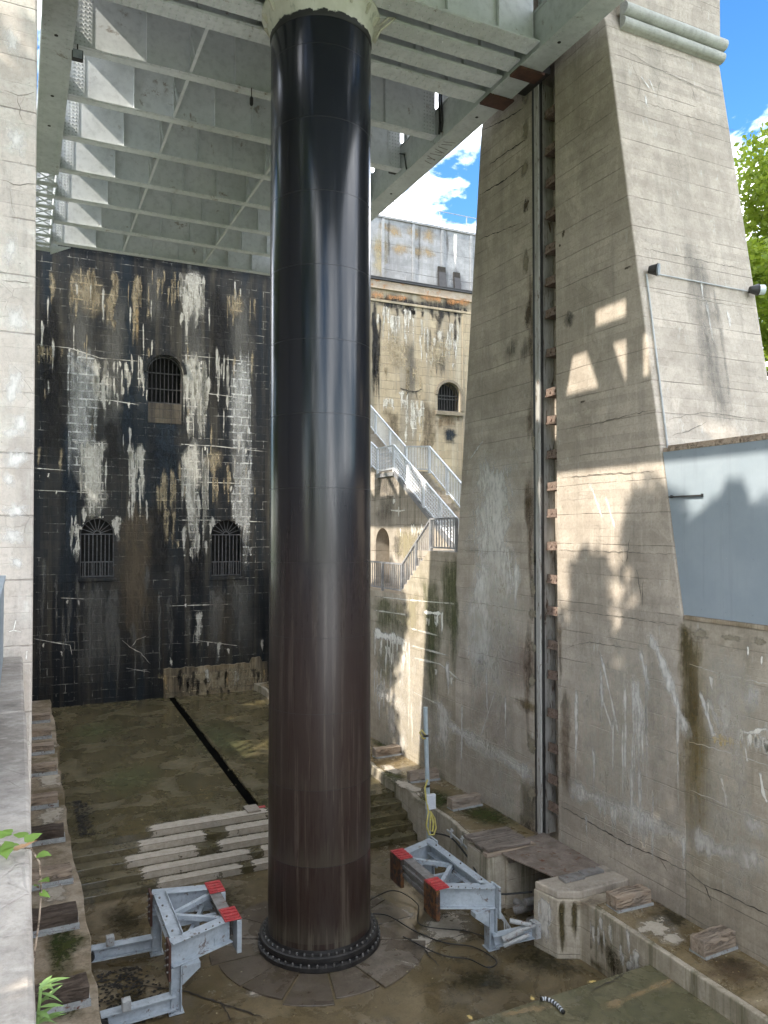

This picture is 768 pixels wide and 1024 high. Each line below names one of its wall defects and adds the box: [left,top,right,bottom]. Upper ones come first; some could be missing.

crack [480,140,525,195]
leakage [371,296,467,449]
leakage [38,268,263,695]
leakage [374,567,459,752]
leakage [448,564,528,778]
leakage [572,629,768,870]
leakage [538,898,577,940]
crack [564,808,767,914]